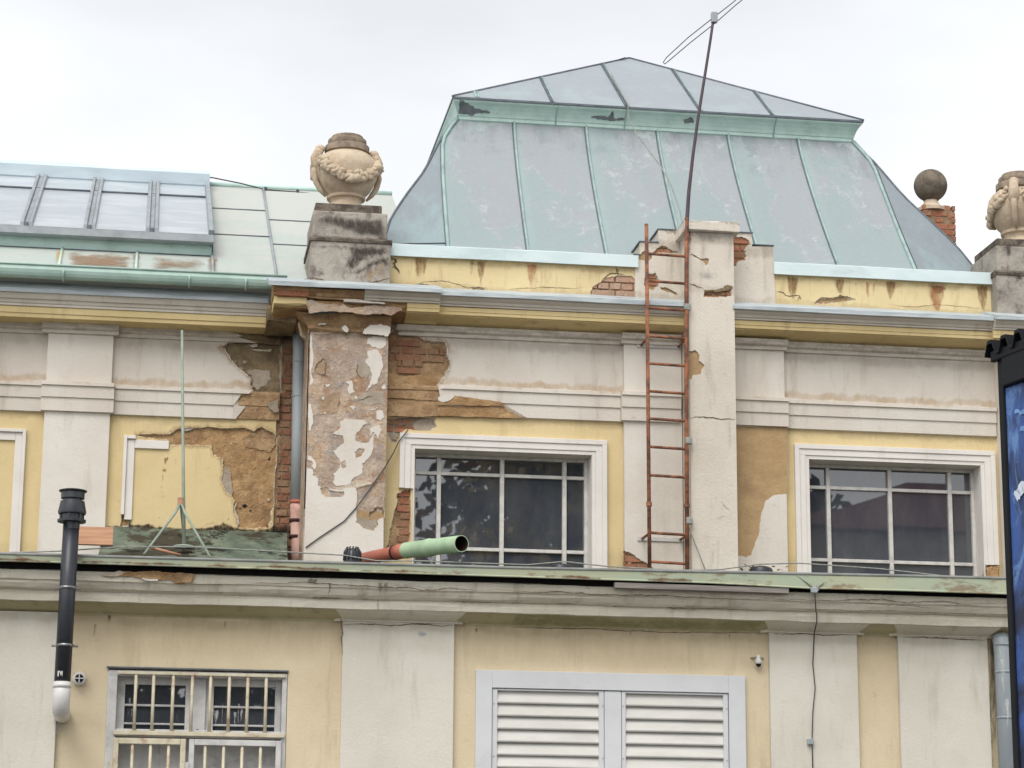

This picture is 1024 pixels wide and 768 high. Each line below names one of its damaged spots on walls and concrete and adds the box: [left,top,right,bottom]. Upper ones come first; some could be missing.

leakage [321,217,382,234]
leakage [157,260,195,268]
leakage [348,247,386,277]
spalling [590,245,709,297]
spalling [733,237,750,266]
spalling [703,285,733,297]
crack [776,291,854,303]
spalling [689,350,704,379]
peeling [135,323,454,563]
peeling [736,426,788,557]
peeling [982,566,999,577]